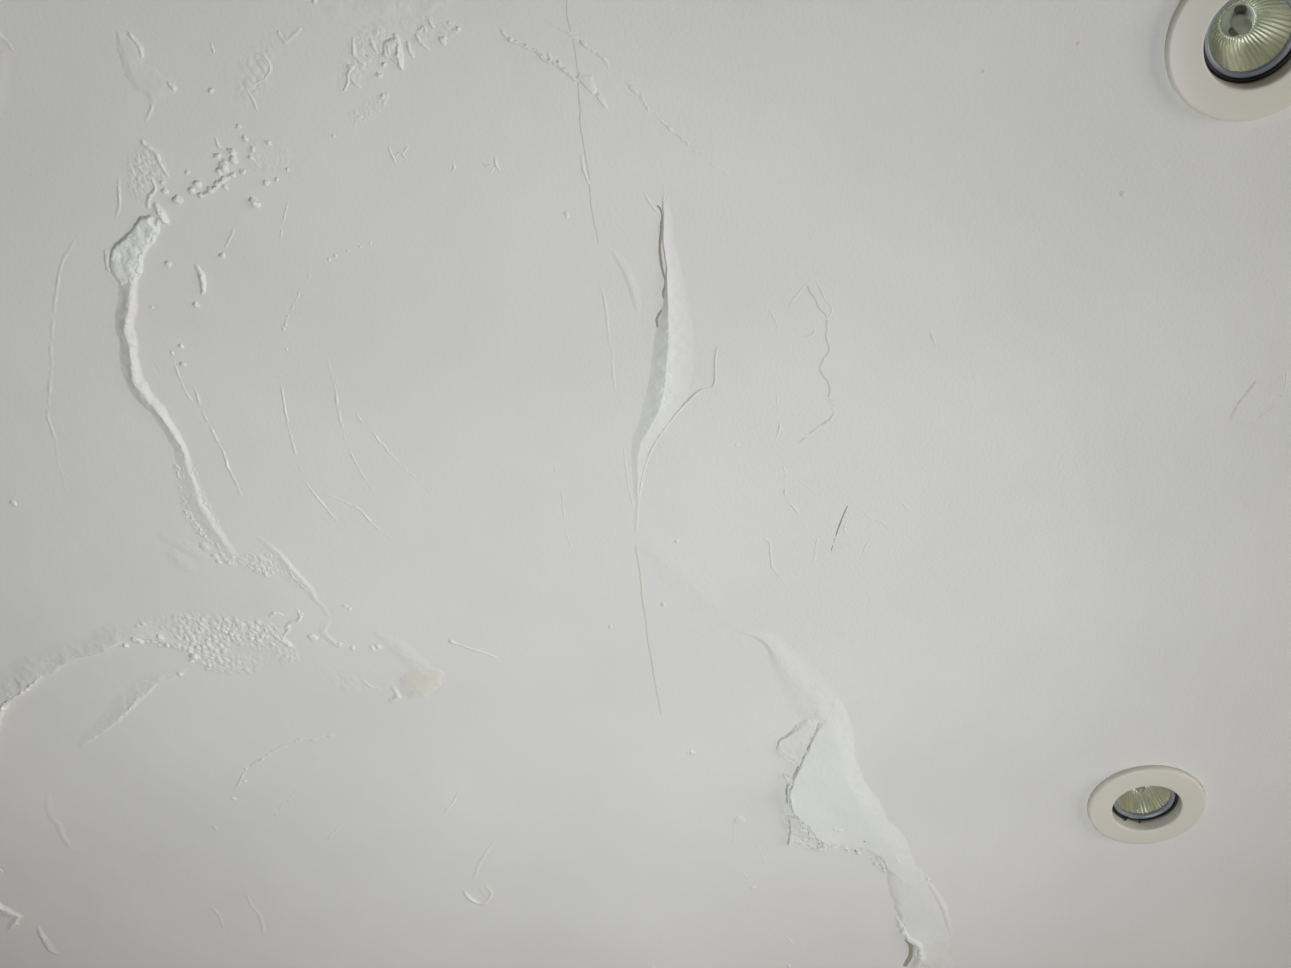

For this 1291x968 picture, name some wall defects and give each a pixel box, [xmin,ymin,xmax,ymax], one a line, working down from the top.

peeling [103,138,238,561]